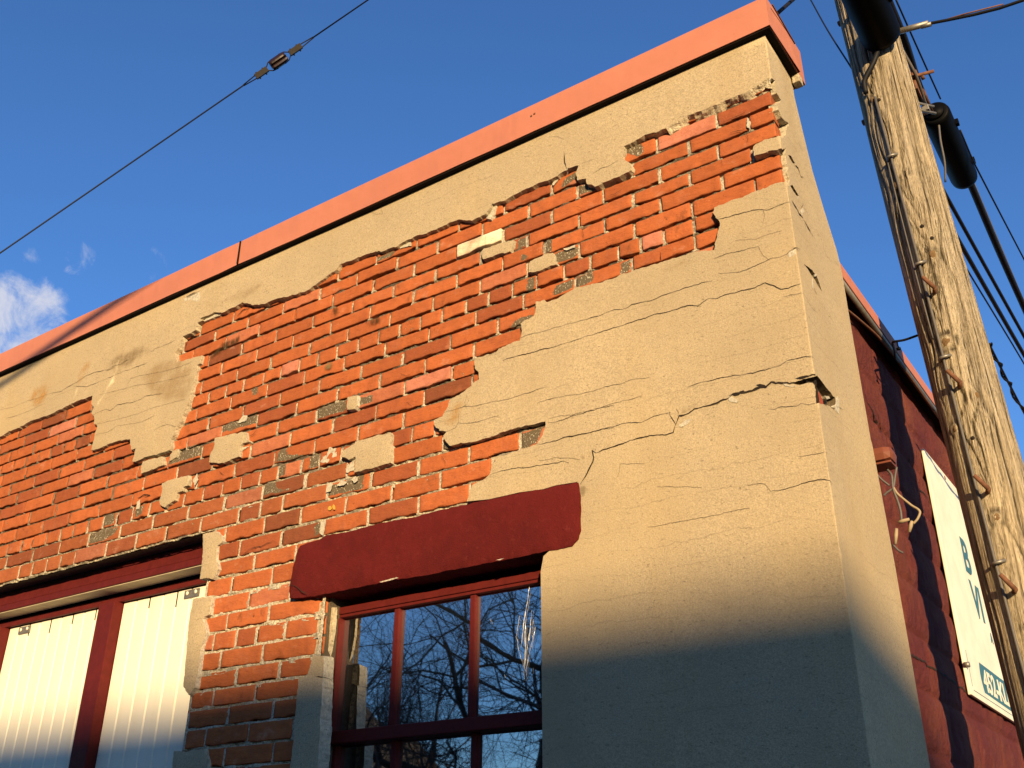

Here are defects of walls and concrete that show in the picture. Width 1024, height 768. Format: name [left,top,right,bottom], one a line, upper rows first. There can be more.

crack [506,201,817,359]
crack [6,341,186,435]
peeling [0,78,795,768]
crack [446,356,815,484]